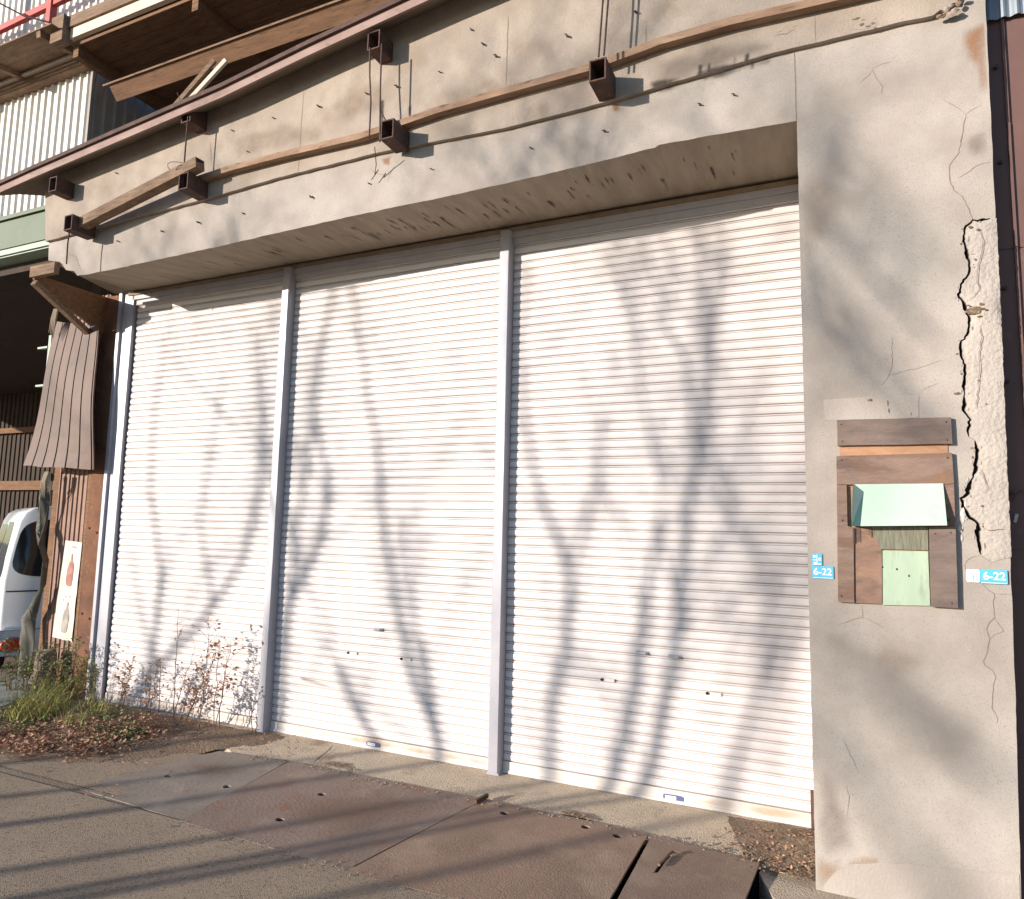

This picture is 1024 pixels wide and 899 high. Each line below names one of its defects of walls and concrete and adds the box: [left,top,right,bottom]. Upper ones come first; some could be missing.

spalling [936,0,963,18]
crack [884,101,1004,723]